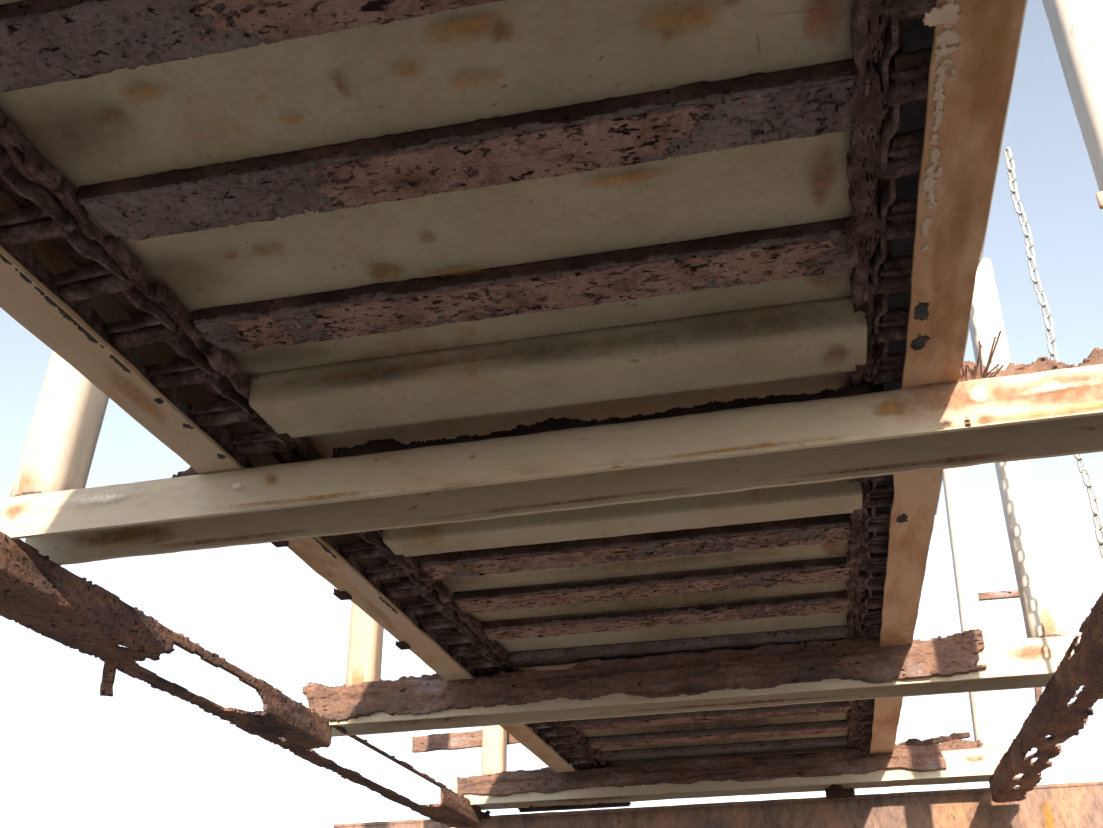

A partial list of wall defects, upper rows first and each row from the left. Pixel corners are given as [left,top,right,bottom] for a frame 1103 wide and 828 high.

peeling [920,0,962,251]
peeling [0,254,130,373]
corrosion [829,456,983,474]
corrosion [57,493,125,505]
corrosion [90,527,162,544]
corrosion [194,533,289,547]
corrosion [333,588,352,600]
corrosion [395,641,411,650]
corrosion [1021,646,1047,658]
peeling [302,629,987,722]
peeling [457,743,947,797]